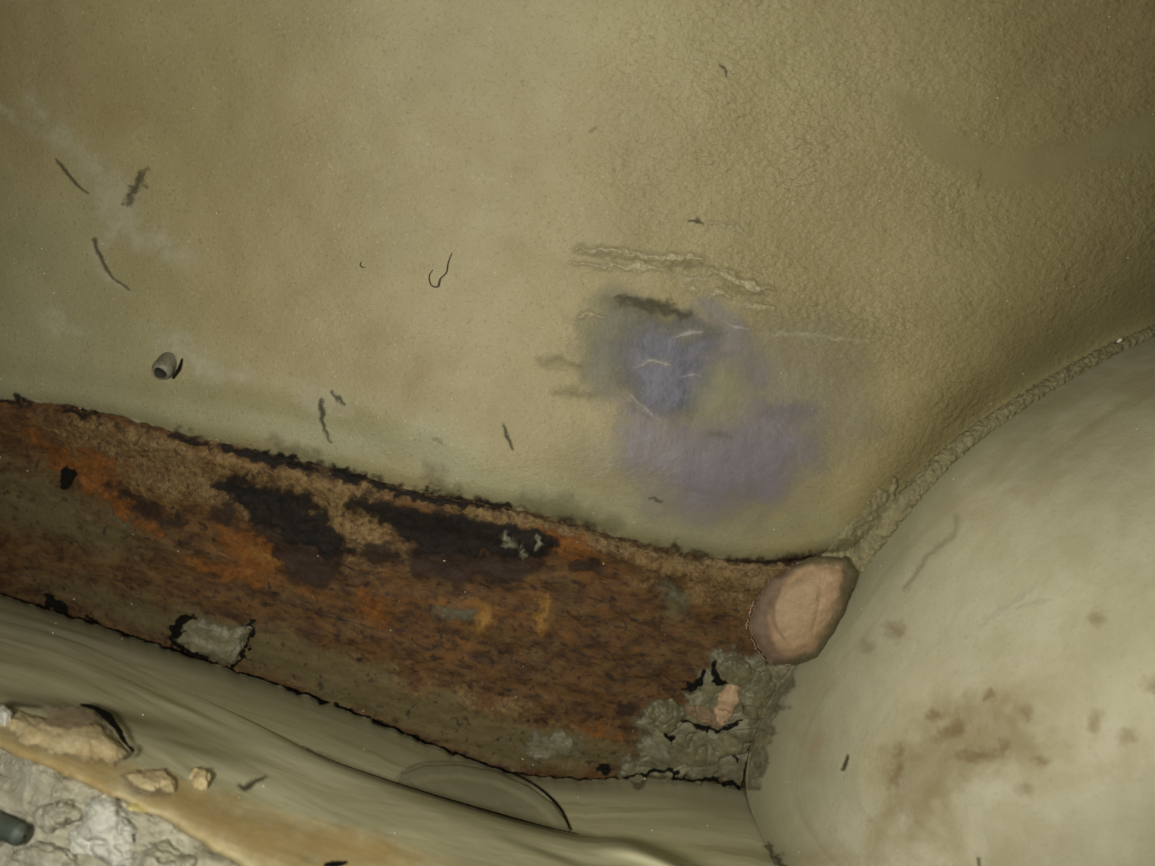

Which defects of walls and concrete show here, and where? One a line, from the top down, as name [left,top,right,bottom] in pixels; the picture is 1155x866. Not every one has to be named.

peeling [571,244,776,311]
corrosion [0,393,818,780]
peeling [0,701,176,814]